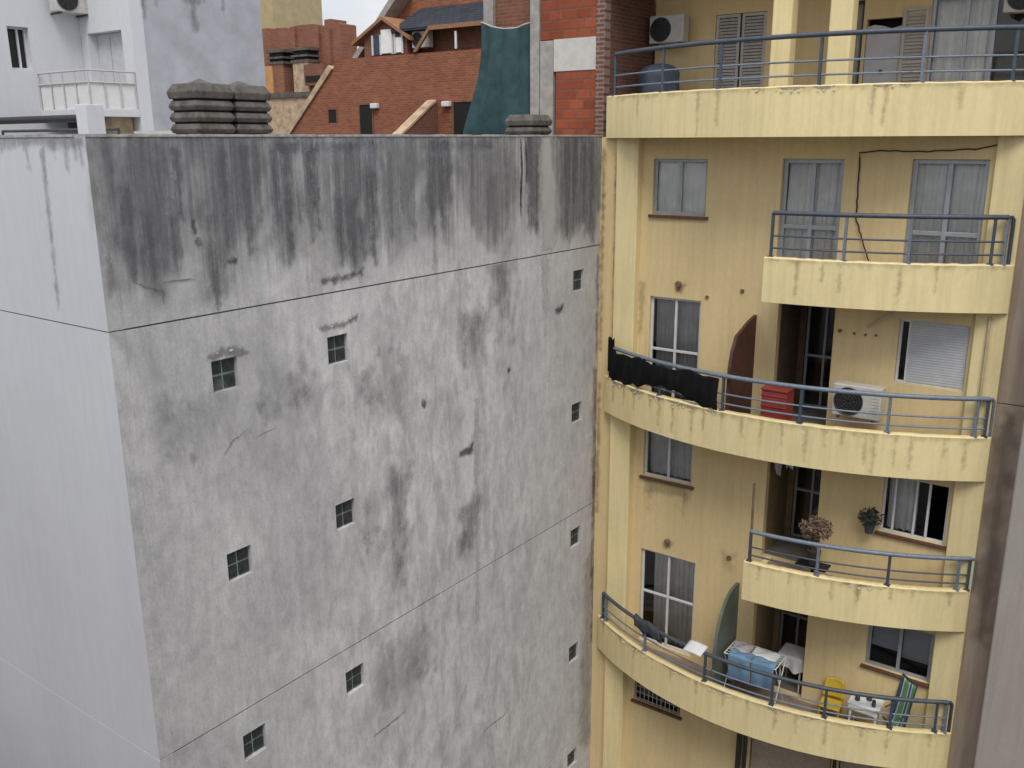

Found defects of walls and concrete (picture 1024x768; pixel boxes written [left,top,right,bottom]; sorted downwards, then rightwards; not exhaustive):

water stain [121,137,259,293]
water stain [271,137,316,251]
water stain [307,138,413,283]
water stain [527,137,599,312]